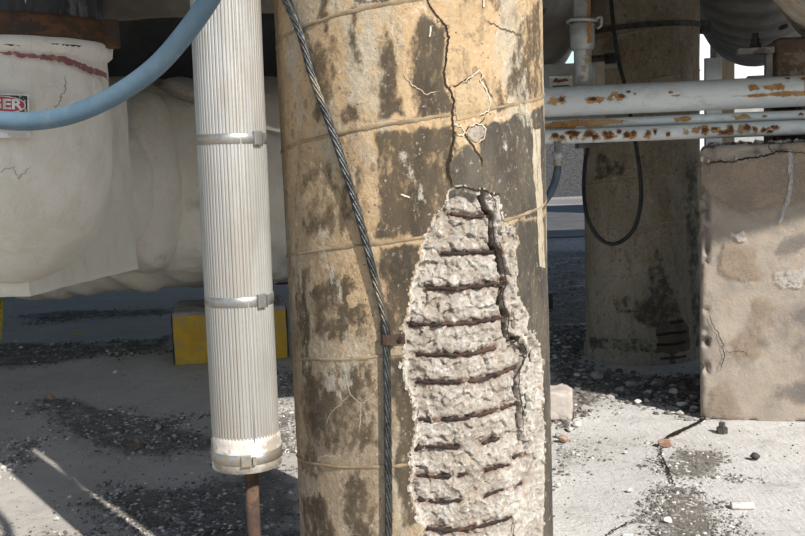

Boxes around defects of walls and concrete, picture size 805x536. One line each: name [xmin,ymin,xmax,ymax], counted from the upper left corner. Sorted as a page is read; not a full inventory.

water stain [349,7,361,62]
crack [700,143,805,164]
water stain [303,163,352,258]
water stain [376,1,553,536]
crack [404,0,527,432]
water stain [685,146,805,347]
water stain [293,266,377,478]
spalling [398,184,547,536]
spalling [655,319,690,365]
crack [709,315,747,371]
crack [646,417,706,486]
water stain [344,472,375,536]